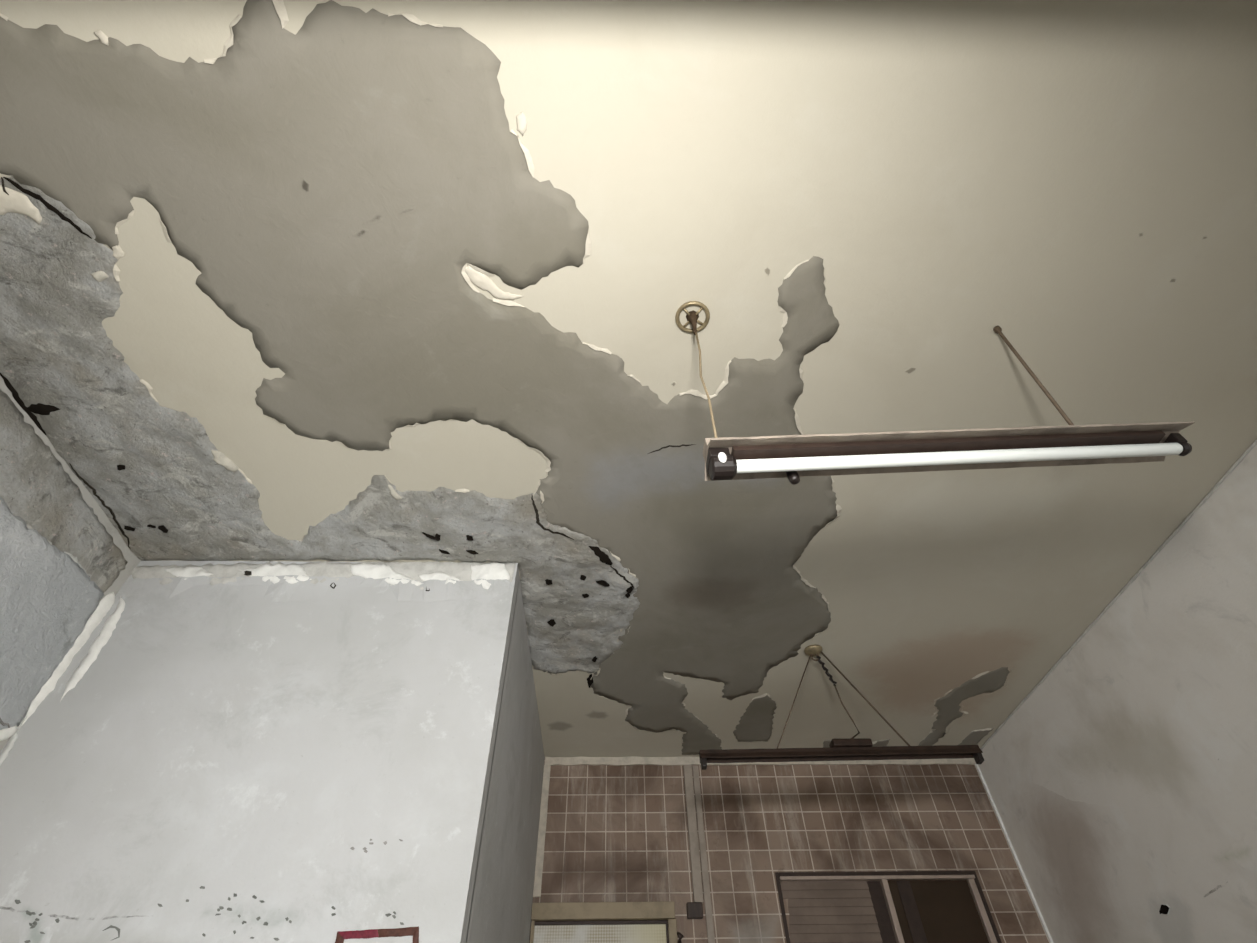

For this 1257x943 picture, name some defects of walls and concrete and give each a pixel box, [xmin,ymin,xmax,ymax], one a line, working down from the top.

peeling [0,0,842,755]
peeling [918,667,1013,746]